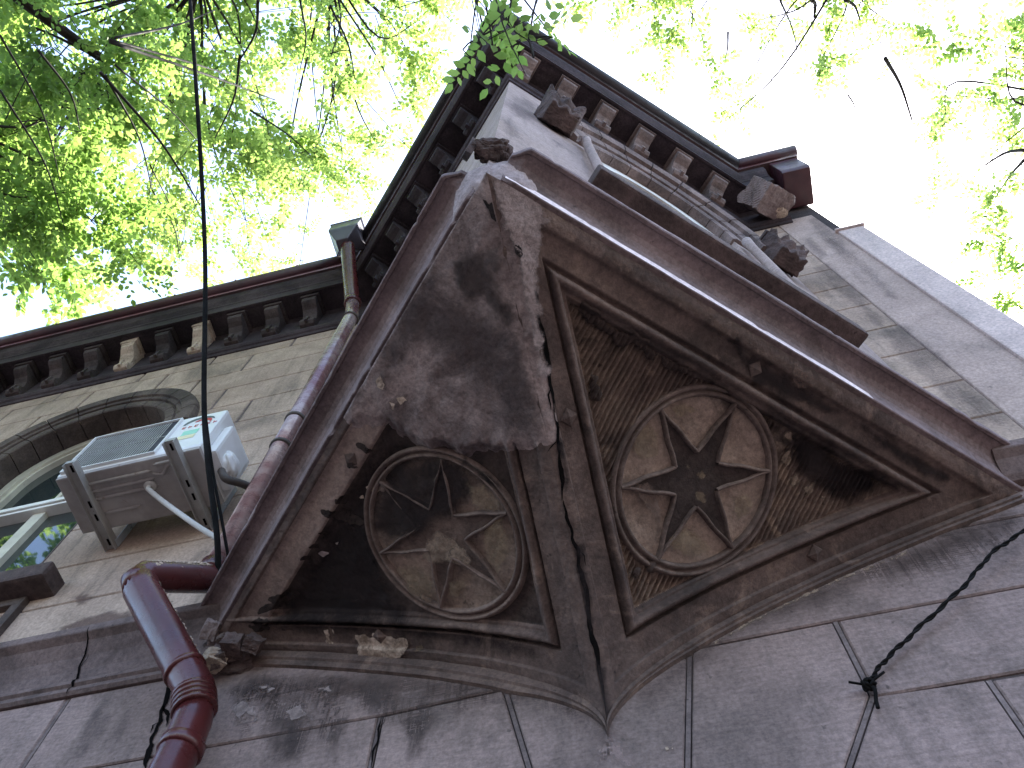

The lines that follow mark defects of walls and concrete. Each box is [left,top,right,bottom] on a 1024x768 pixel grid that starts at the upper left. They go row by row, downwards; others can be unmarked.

spalling [737,175,796,219]
leakage [456,253,512,323]
spalling [452,137,552,376]
leakage [402,280,524,421]
peeling [320,477,386,526]
crack [535,290,601,667]
peeling [300,531,338,561]
crack [66,629,89,693]
spalling [199,587,300,677]
spalling [355,633,422,658]
crack [143,687,171,768]